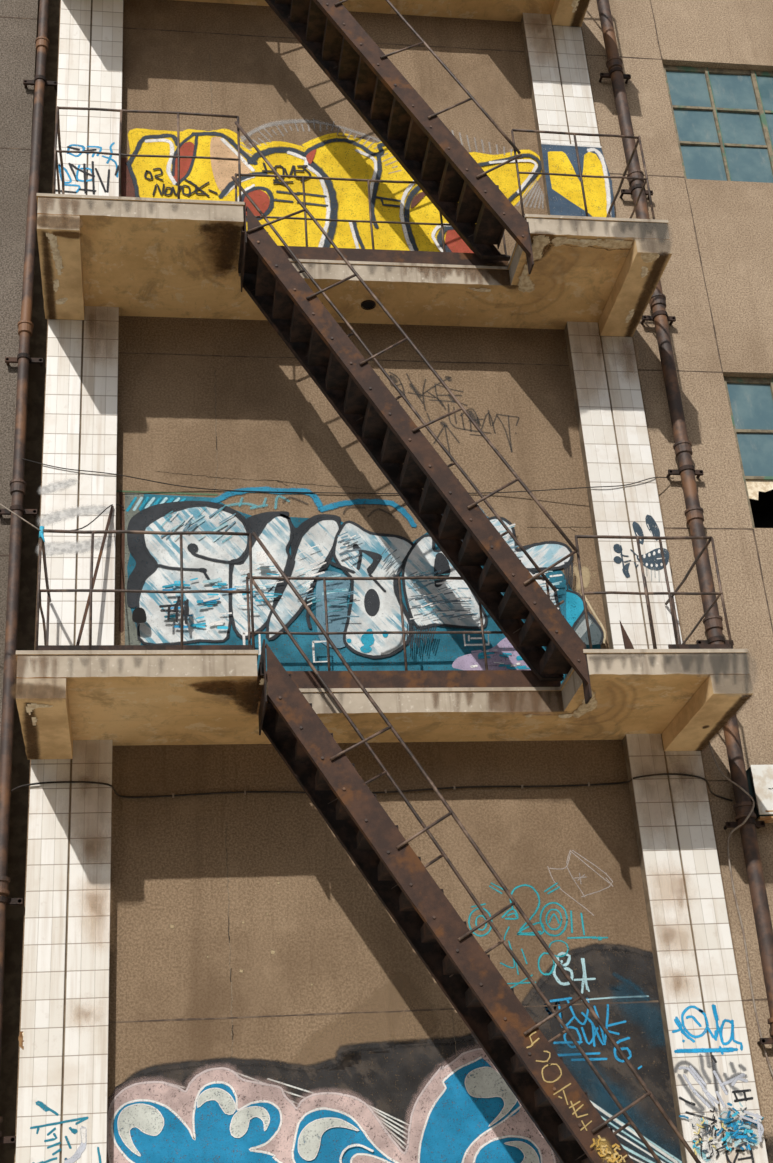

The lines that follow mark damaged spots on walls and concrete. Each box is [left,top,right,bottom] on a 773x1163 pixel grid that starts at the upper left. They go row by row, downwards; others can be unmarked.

peeling [518,231,668,337]